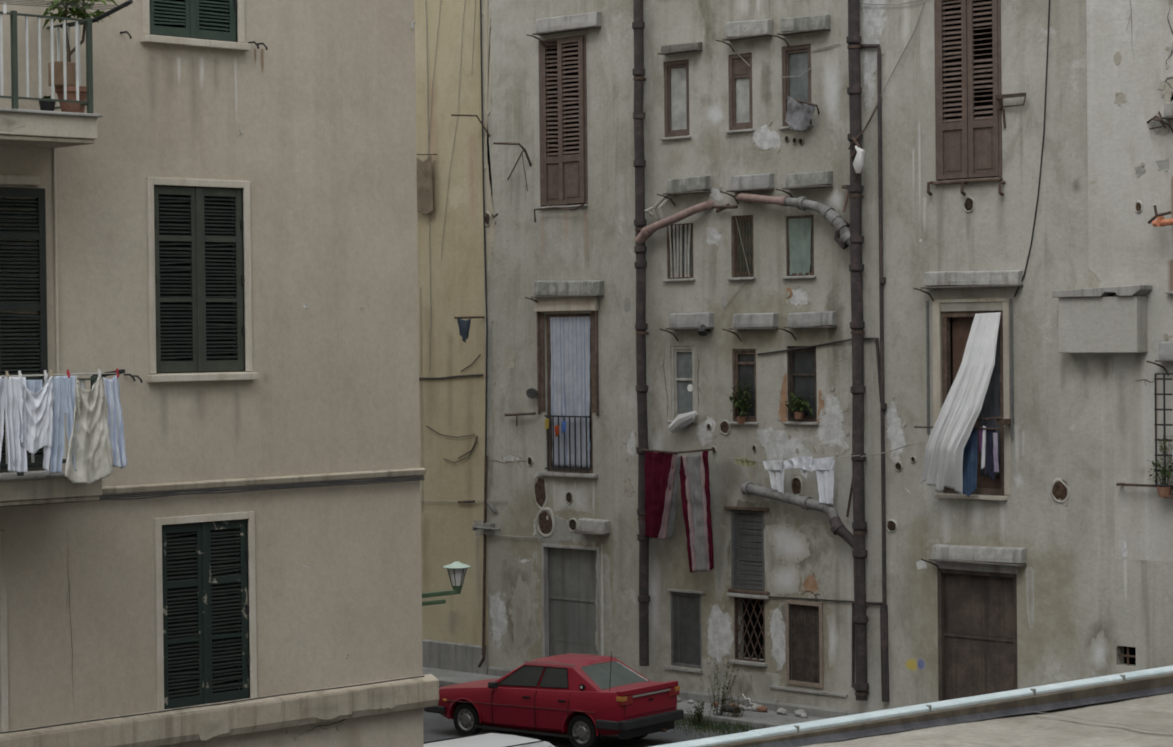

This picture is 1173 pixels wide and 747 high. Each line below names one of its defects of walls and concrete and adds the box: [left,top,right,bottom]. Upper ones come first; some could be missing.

flaking render [1150,43,1173,134]
crack [1158,9,1173,96]
peeling [749,119,804,152]
peeling [752,373,851,461]
peeling [885,395,916,471]
peeling [501,454,592,538]
spalling [790,474,803,496]
peeling [487,587,512,650]
peeling [704,604,734,668]